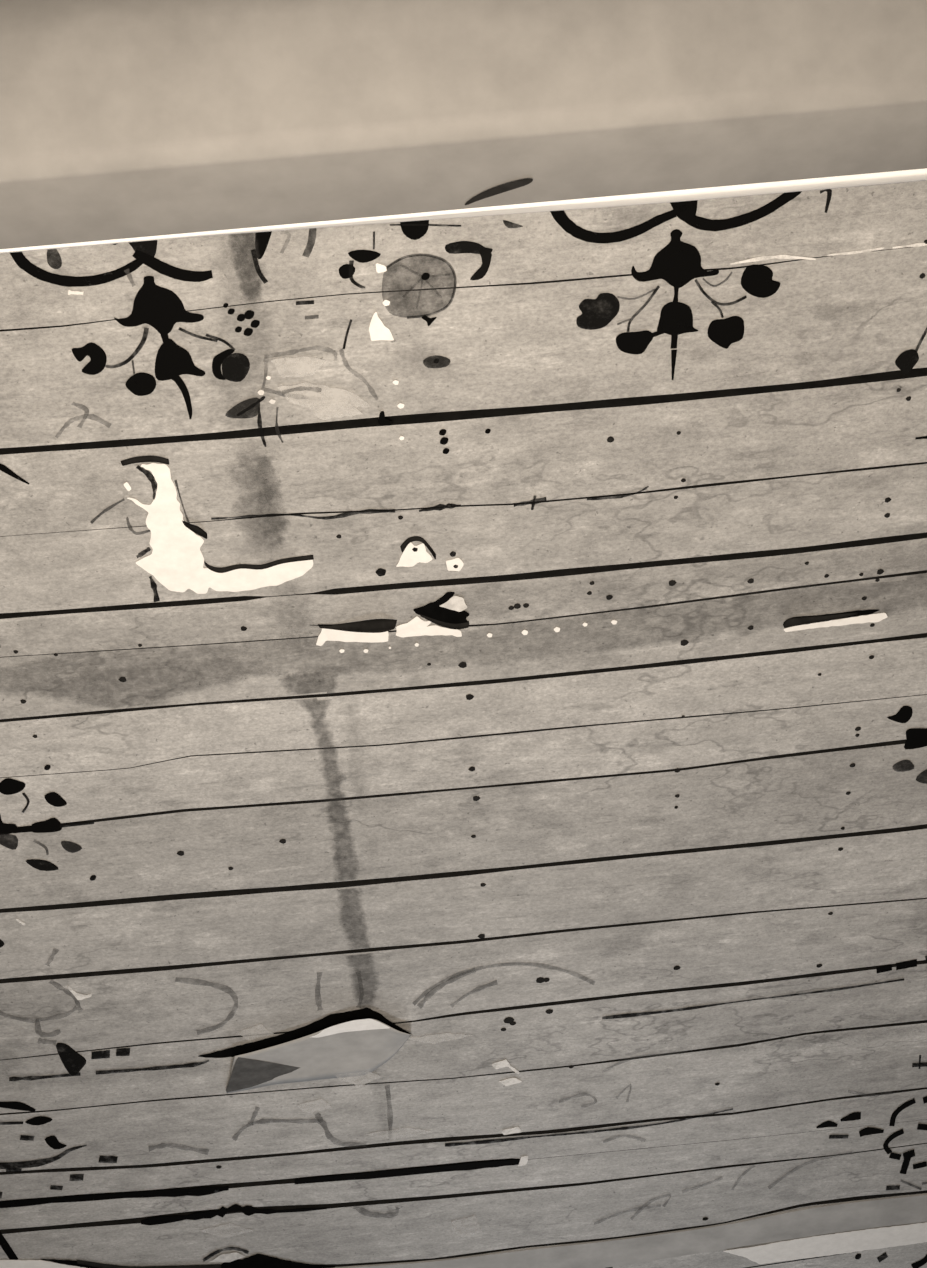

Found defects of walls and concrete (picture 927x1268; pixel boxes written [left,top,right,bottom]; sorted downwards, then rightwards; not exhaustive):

peeling [90,456,314,594]
peeling [376,536,464,576]
peeling [312,592,469,653]
peeling [783,609,888,632]
peeling [0,1247,335,1268]
peeling [723,1222,927,1264]